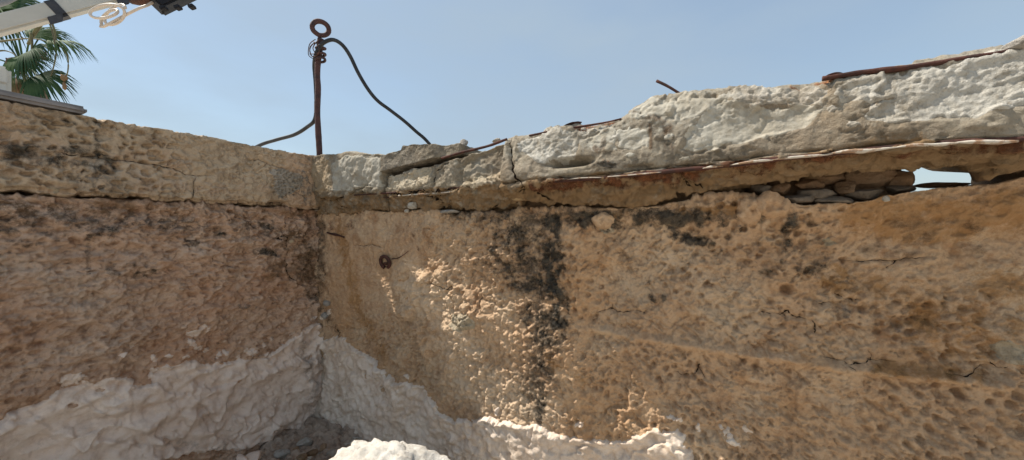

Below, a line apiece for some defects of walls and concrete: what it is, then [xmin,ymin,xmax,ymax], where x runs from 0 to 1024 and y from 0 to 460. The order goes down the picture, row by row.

spalling [441,35,1024,184]
crack [495,140,551,207]
corrosion [528,161,708,192]
corrosion [721,160,792,178]
corrosion [804,154,858,164]
corrosion [944,142,1024,154]
damp [485,208,726,424]